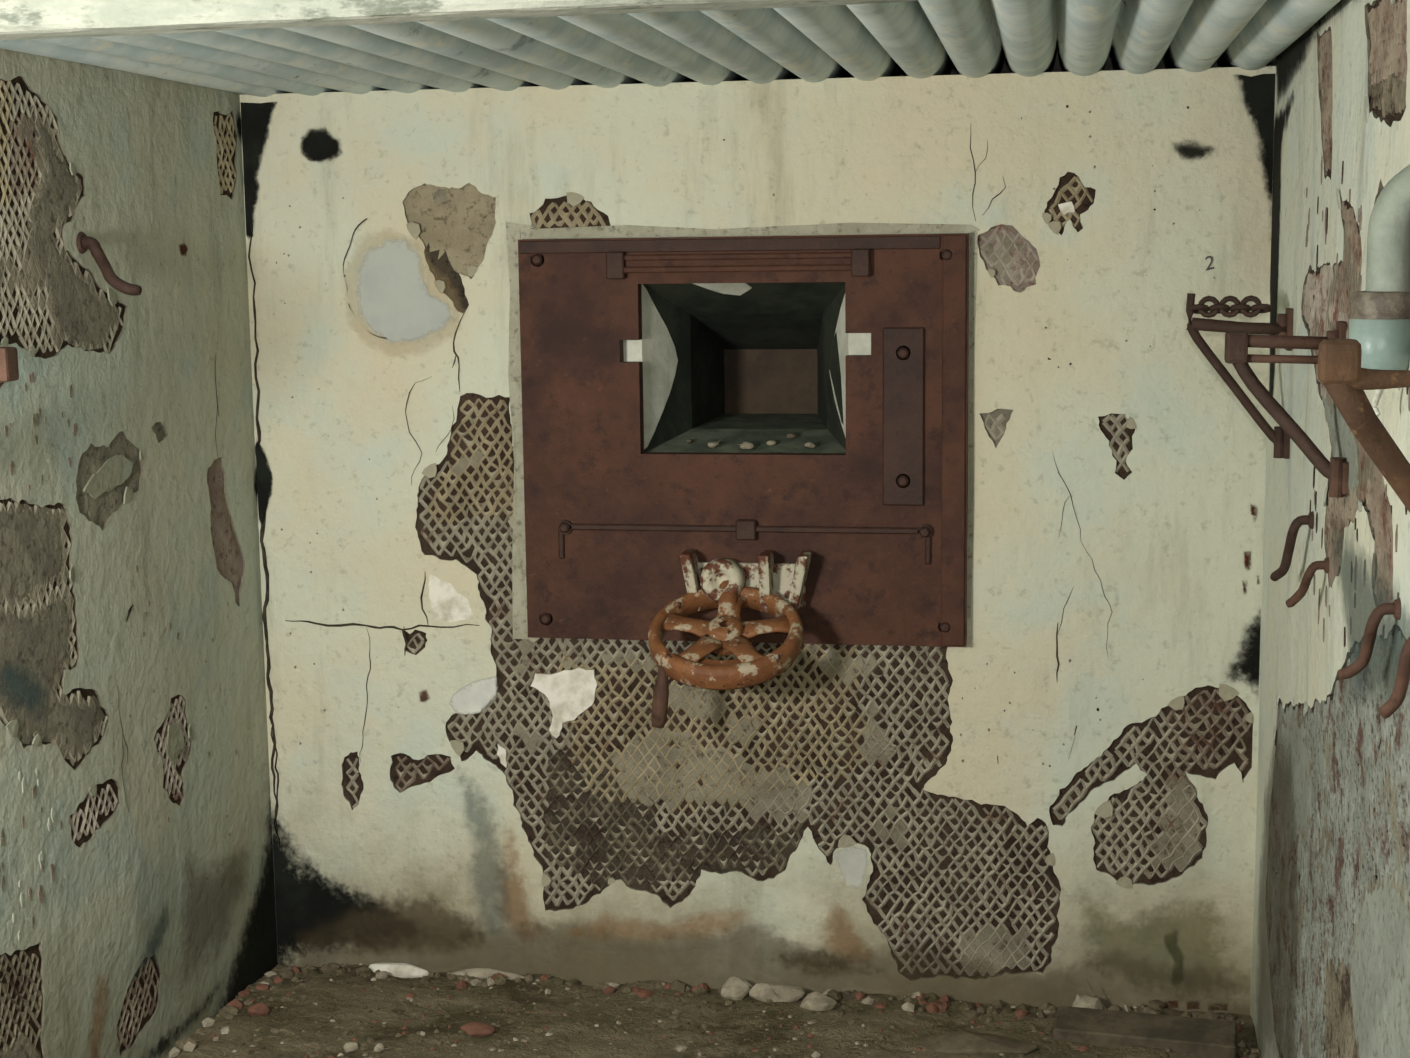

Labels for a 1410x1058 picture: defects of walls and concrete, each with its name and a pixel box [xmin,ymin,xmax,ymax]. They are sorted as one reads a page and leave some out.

spalling [1364,0,1407,125]
spalling [0,76,126,392]
spalling [403,183,496,313]
spalling [1042,172,1096,235]
spalling [1303,30,1407,642]
spalling [0,828,55,1058]
spalling [18,768,118,847]
spalling [0,384,144,769]
water stain [149,802,474,1058]
spalling [391,393,1254,980]
rust [1243,552,1259,592]
spalling [1267,622,1410,1058]